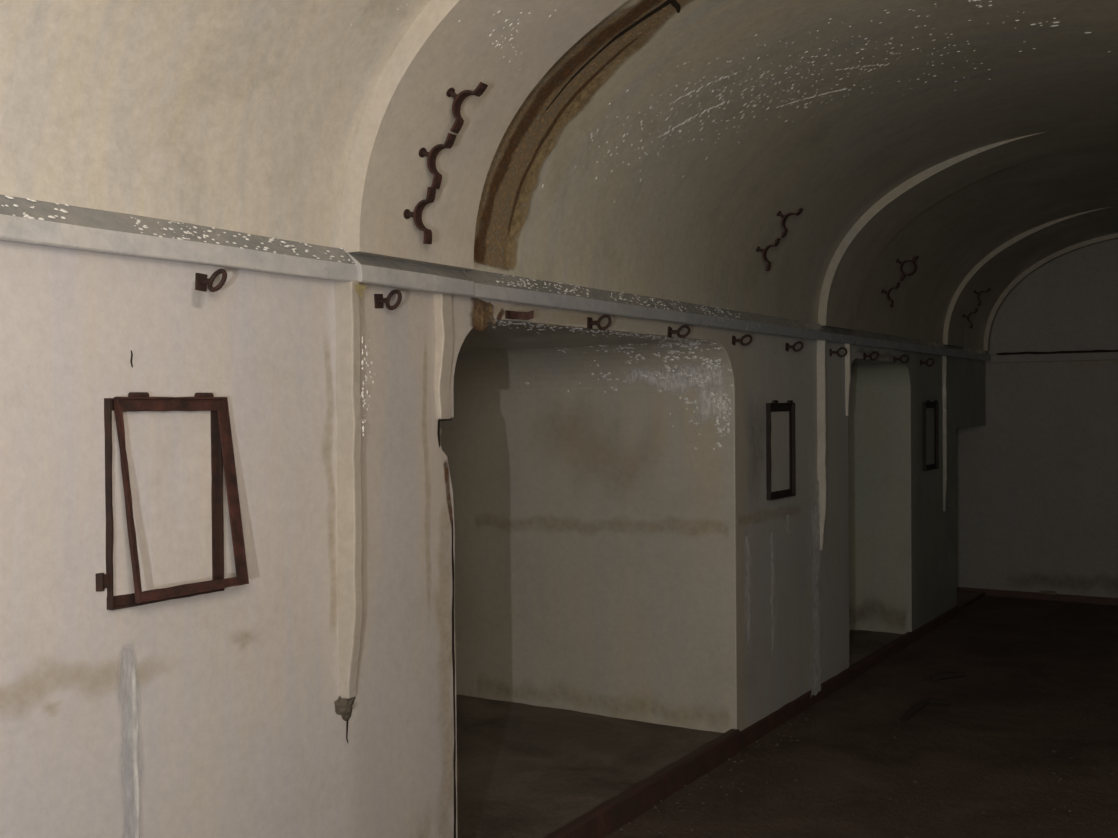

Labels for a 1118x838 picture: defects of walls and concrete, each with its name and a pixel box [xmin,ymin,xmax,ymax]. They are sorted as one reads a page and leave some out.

flaking render [334,696,355,743]